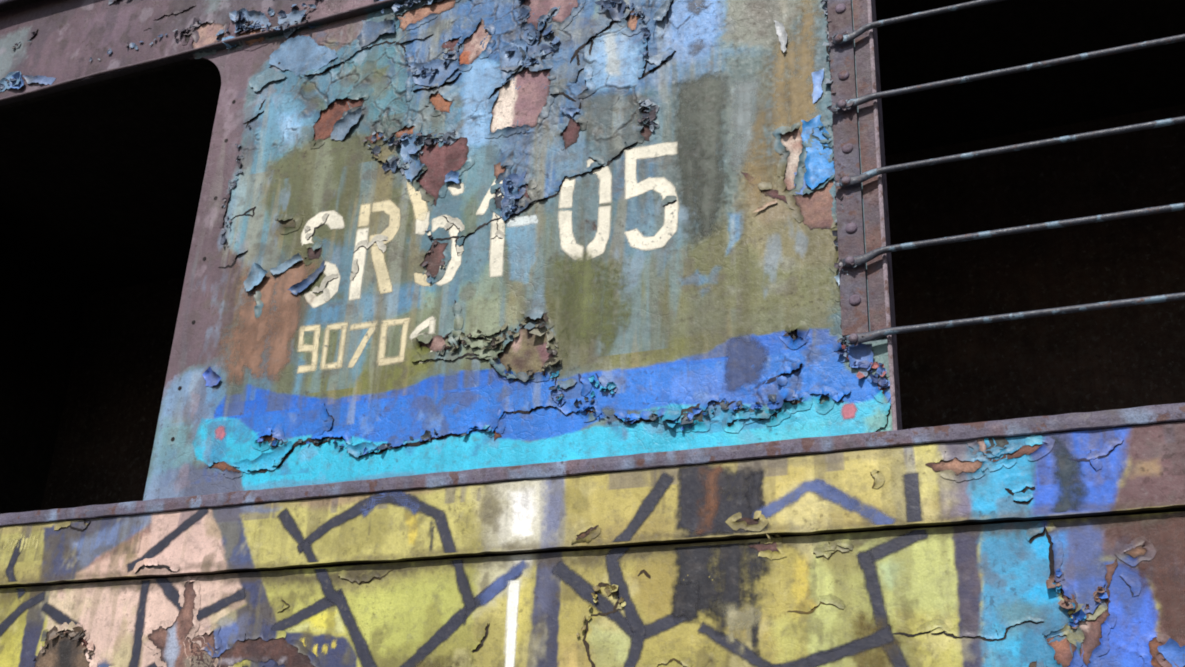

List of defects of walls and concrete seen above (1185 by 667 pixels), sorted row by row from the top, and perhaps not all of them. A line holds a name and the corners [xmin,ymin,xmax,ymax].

peeling [126,3,338,92]
peeling [308,92,369,149]
peeling [741,0,857,286]
peeling [489,158,536,218]
peeling [244,242,325,295]
peeling [412,309,857,433]
peeling [833,336,891,403]
peeling [204,424,438,479]
peeling [925,435,1055,482]
peeling [29,621,98,667]
peeling [142,576,323,667]
peeling [1022,536,1156,667]